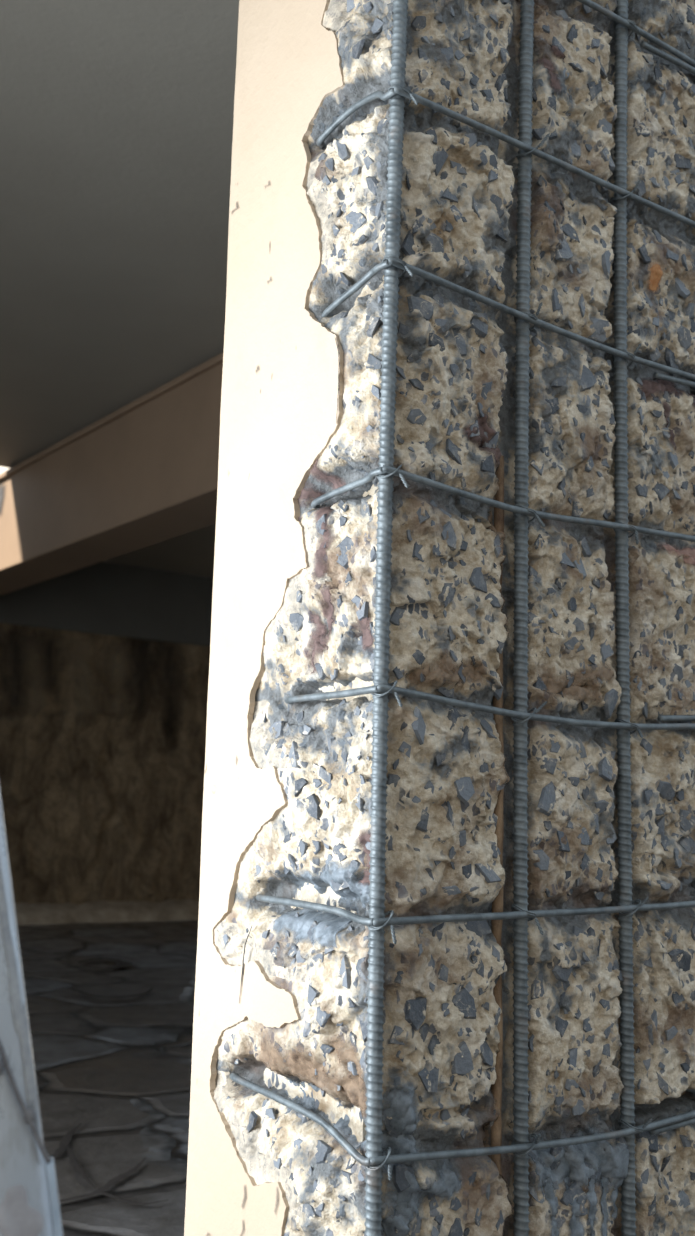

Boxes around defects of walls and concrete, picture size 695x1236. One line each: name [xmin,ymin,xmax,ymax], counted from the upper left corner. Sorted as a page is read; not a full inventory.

corrosion [298,458,345,673]
corrosion [352,617,373,648]
spalling [214,0,695,1236]